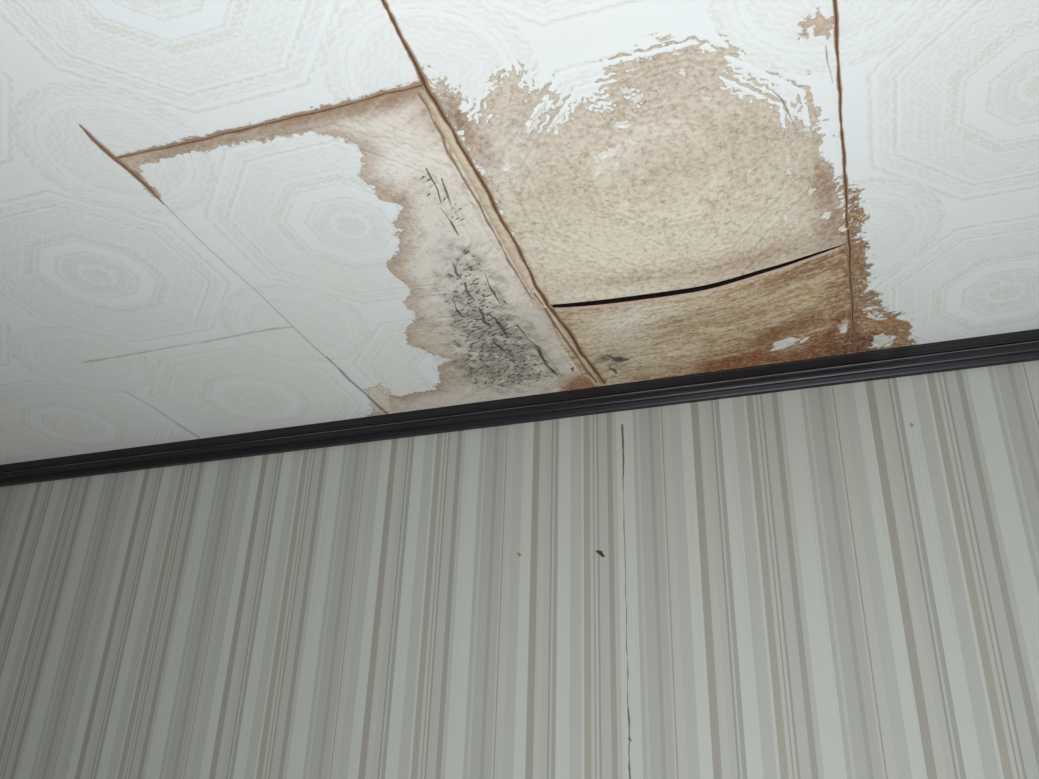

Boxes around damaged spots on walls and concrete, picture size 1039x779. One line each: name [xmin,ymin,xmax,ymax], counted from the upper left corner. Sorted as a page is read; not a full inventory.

crack [79,0,863,386]
water stain [119,33,918,416]